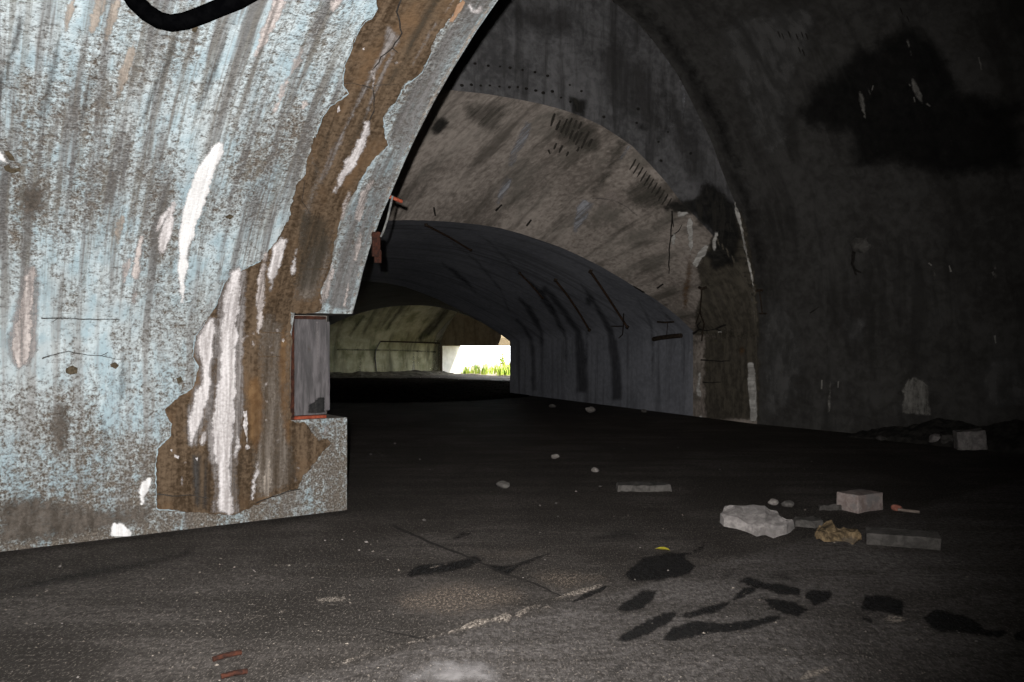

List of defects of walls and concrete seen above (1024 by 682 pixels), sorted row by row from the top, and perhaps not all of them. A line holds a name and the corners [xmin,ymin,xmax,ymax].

leakage [65,0,75,31]
leakage [89,0,120,39]
leakage [254,0,286,57]
crack [342,0,403,122]
leakage [910,79,930,107]
leakage [8,267,39,368]
leakage [123,236,143,283]
leakage [156,143,224,303]
peeling [0,0,460,541]
leakage [603,44,760,421]